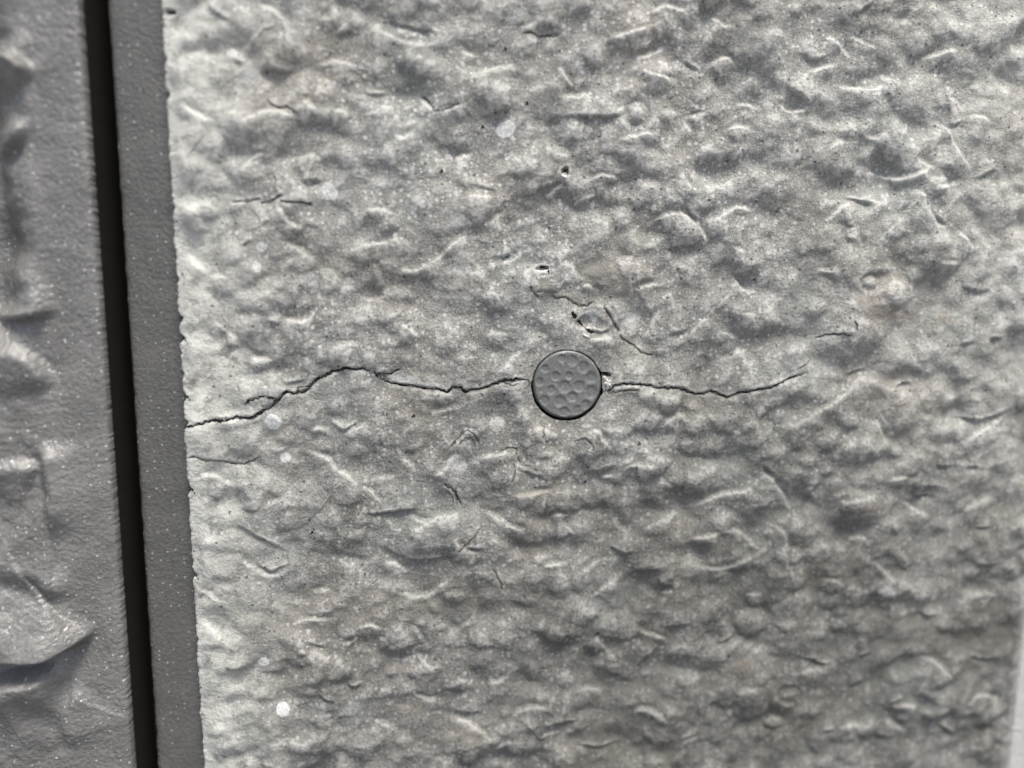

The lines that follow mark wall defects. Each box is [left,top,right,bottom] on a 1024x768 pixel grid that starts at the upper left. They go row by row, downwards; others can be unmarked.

crack [530,287,653,355]
crack [184,366,532,428]
crack [602,362,809,398]